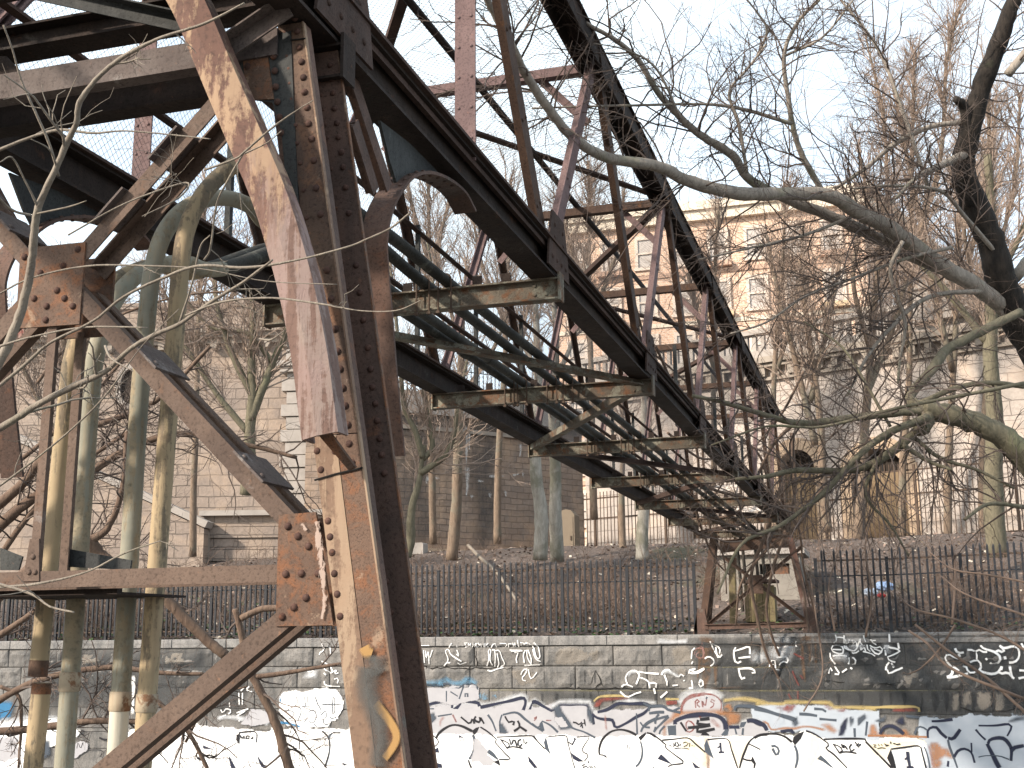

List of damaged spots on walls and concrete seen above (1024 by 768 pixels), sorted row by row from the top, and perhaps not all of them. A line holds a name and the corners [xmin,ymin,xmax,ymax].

peeling [302,521,328,619]